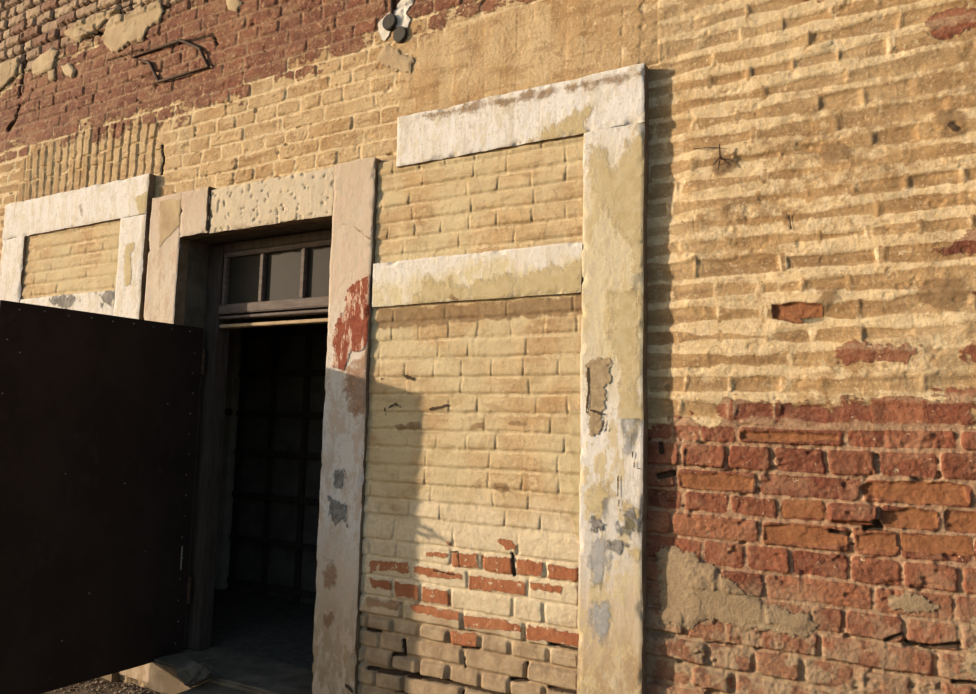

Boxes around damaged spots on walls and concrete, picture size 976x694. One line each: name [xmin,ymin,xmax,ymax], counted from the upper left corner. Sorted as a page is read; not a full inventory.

peeling [925,3,976,40]
peeling [0,0,553,164]
peeling [135,191,148,214]
peeling [931,229,976,256]
peeling [585,288,976,694]
peeling [366,538,579,647]